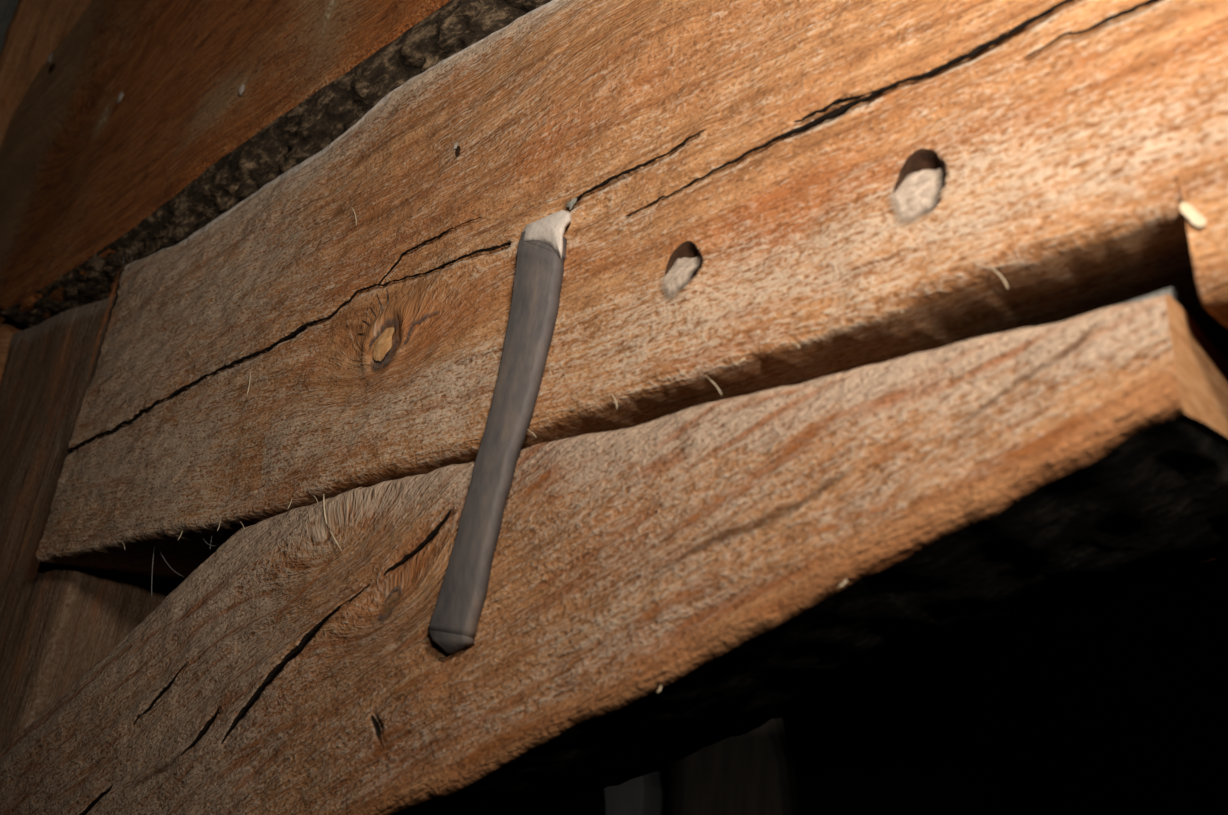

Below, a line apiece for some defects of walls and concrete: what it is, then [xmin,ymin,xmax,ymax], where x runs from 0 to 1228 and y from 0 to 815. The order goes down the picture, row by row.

crack [575,129,706,203]
crack [625,0,1158,217]
crack [68,217,511,452]
crack [133,662,187,725]
crack [181,509,452,754]